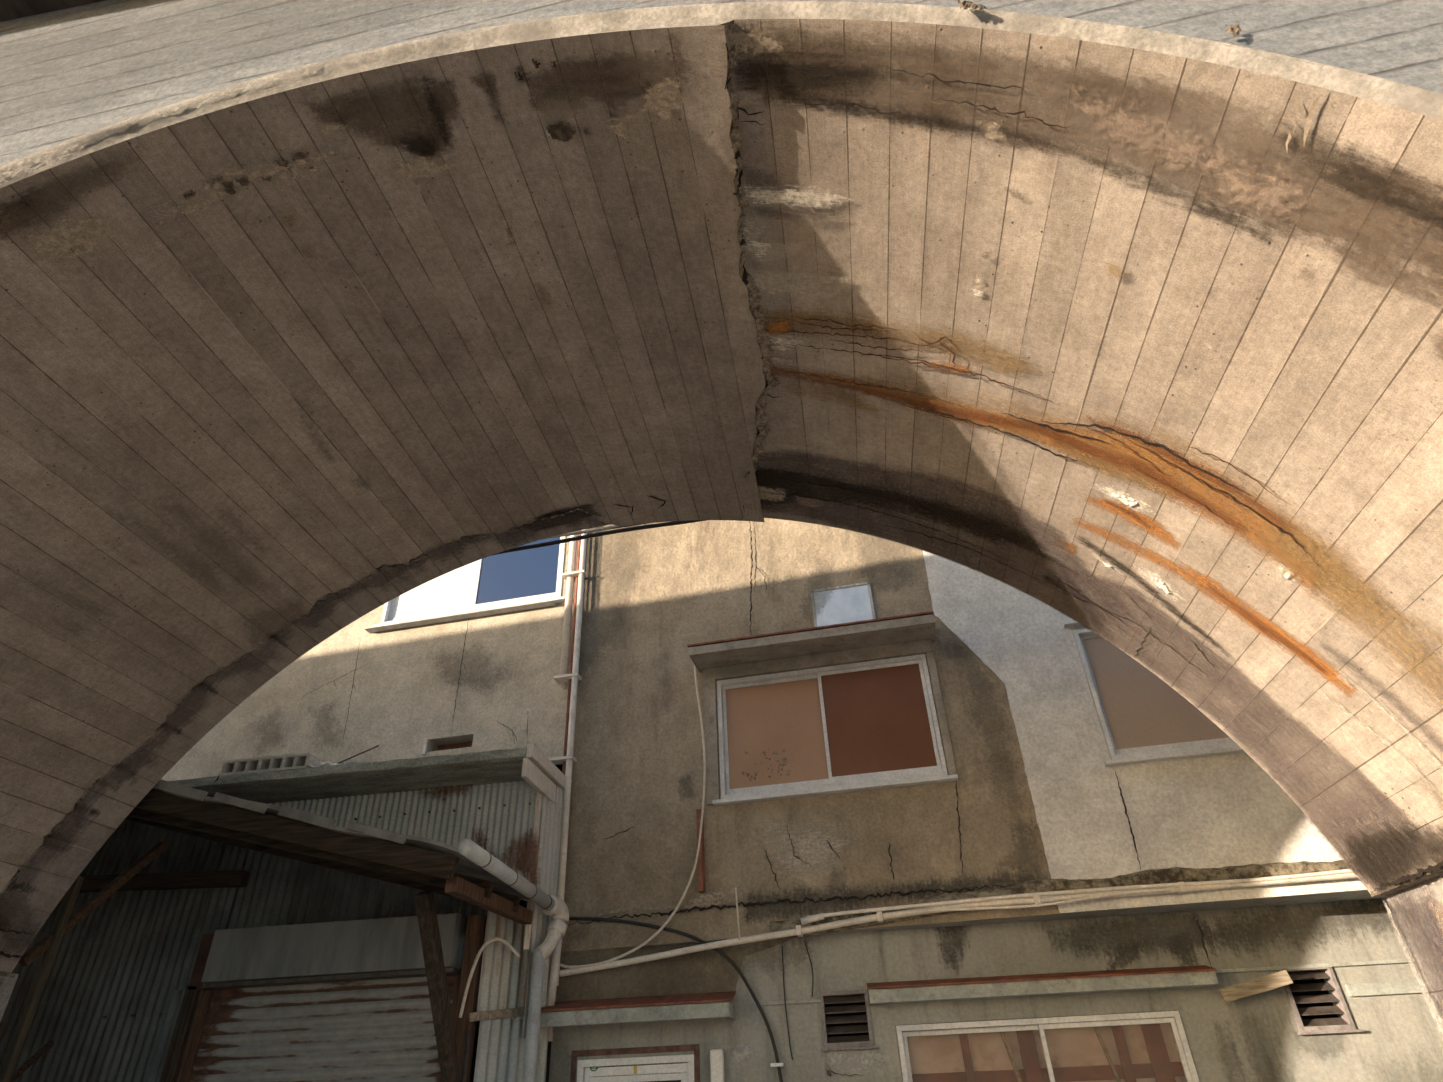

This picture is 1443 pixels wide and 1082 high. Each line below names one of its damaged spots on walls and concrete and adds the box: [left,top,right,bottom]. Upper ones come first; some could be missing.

water stain [313,79,458,157]
water stain [530,54,682,109]
peeling [156,147,335,219]
water stain [731,22,1443,305]
crack [725,44,780,635]
corrosion [766,312,1053,402]
corrosion [768,367,1443,704]
water stain [745,452,1443,1012]
crack [1373,861,1443,890]
crack [0,951,29,961]